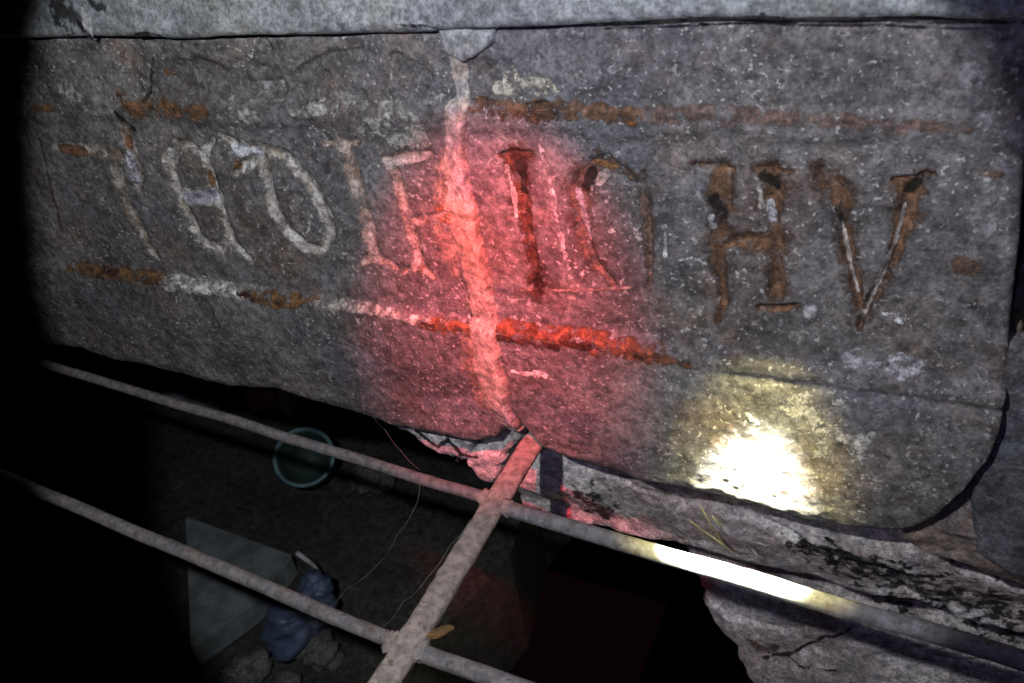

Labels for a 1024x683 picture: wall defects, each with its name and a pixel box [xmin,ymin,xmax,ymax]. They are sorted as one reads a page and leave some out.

rust [116,90,210,121]
rust [468,95,973,135]
crack [396,24,525,431]
rust [66,262,170,286]
rust [236,288,320,310]
rust [416,317,470,336]
rust [495,318,691,370]